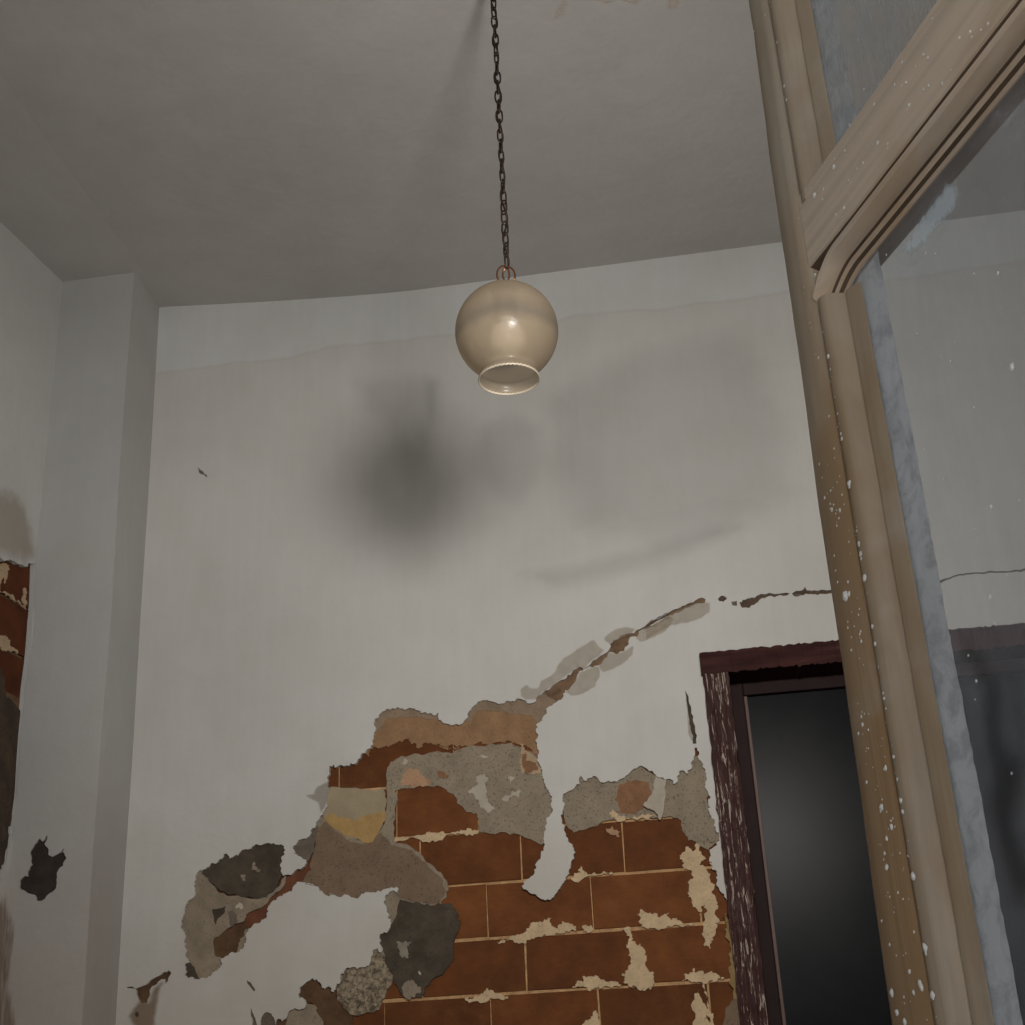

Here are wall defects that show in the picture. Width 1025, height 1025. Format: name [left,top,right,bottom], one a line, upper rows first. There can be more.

flaking render [0,561,30,869]
flaking render [20,837,66,901]
flaking render [128,971,171,1025]
flaking render [181,693,740,1025]